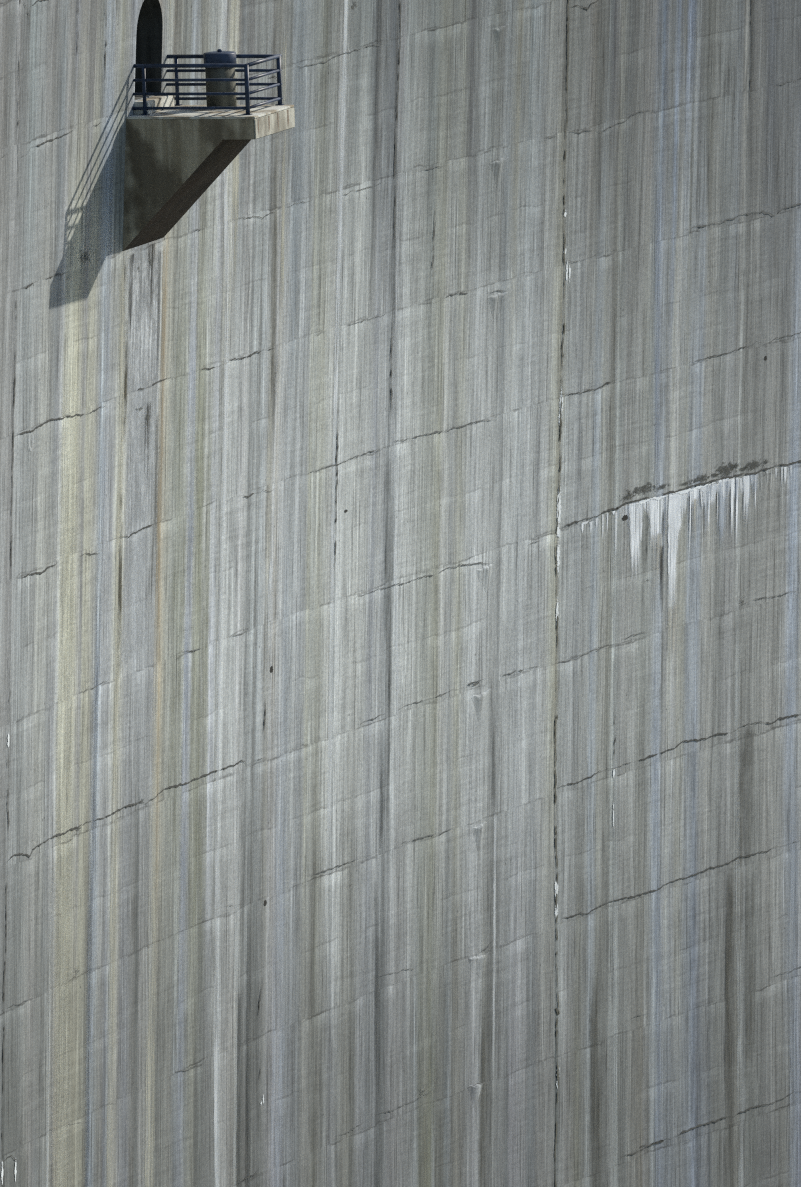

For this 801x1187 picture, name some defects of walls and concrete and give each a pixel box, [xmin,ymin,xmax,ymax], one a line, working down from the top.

crack [530,460,801,544]
crack [359,562,492,596]
water stain [581,459,792,651]